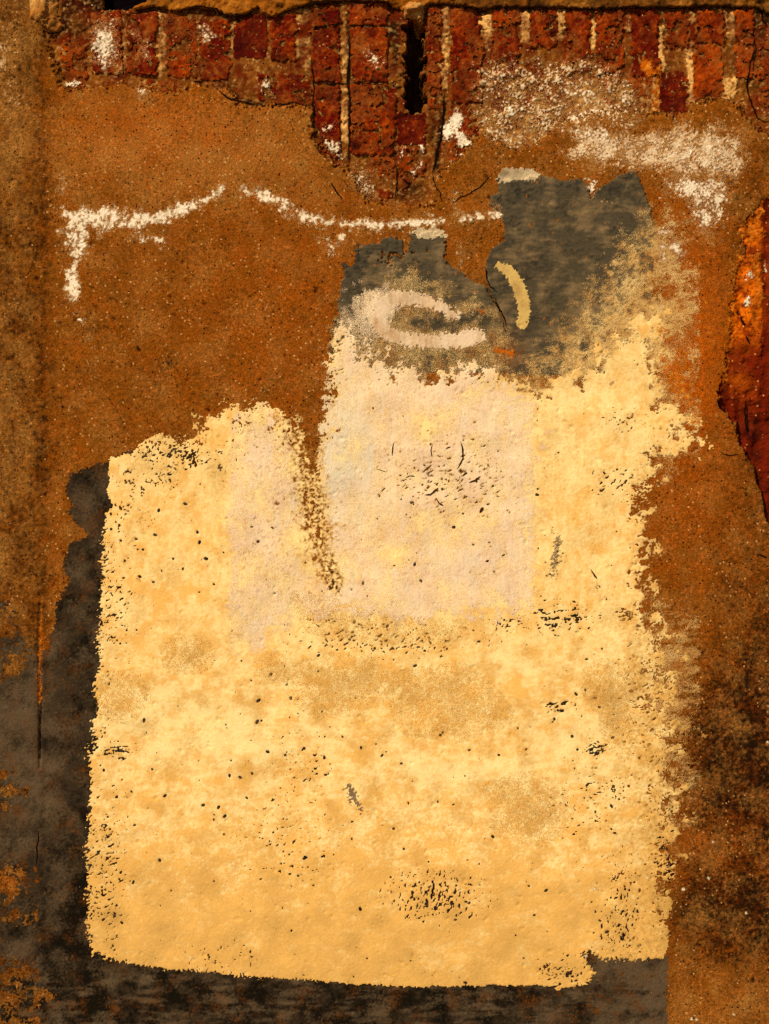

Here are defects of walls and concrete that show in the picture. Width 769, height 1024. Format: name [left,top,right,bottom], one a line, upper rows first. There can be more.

efflorescence [54,167,504,359]
spalling [44,0,769,209]
efflorescence [439,50,754,272]
corrosion [696,202,766,383]
peeling [0,171,714,1024]